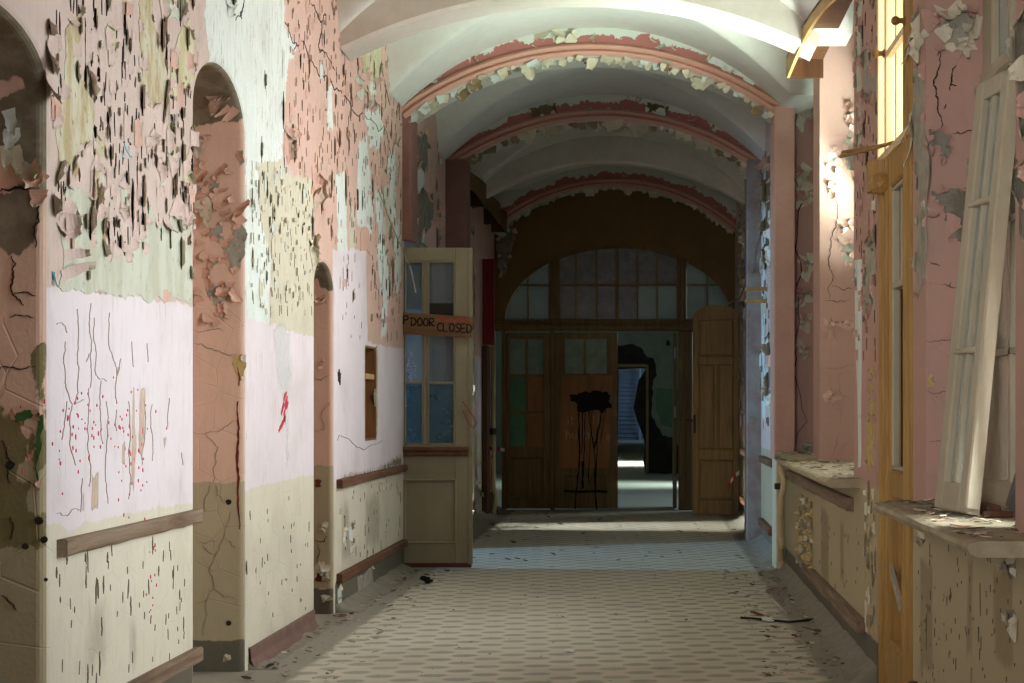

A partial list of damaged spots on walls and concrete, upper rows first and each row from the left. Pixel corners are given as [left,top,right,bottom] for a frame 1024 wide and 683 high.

crack [0,186,40,248]
crack [10,256,36,318]
crack [285,3,399,158]
peeling [0,0,774,440]
crack [825,196,851,323]
peeling [825,0,877,361]
peeling [898,0,983,301]
crack [929,51,972,134]
peeling [12,405,45,491]
crack [56,303,170,516]
peeling [794,493,832,569]
peeling [919,545,1021,681]